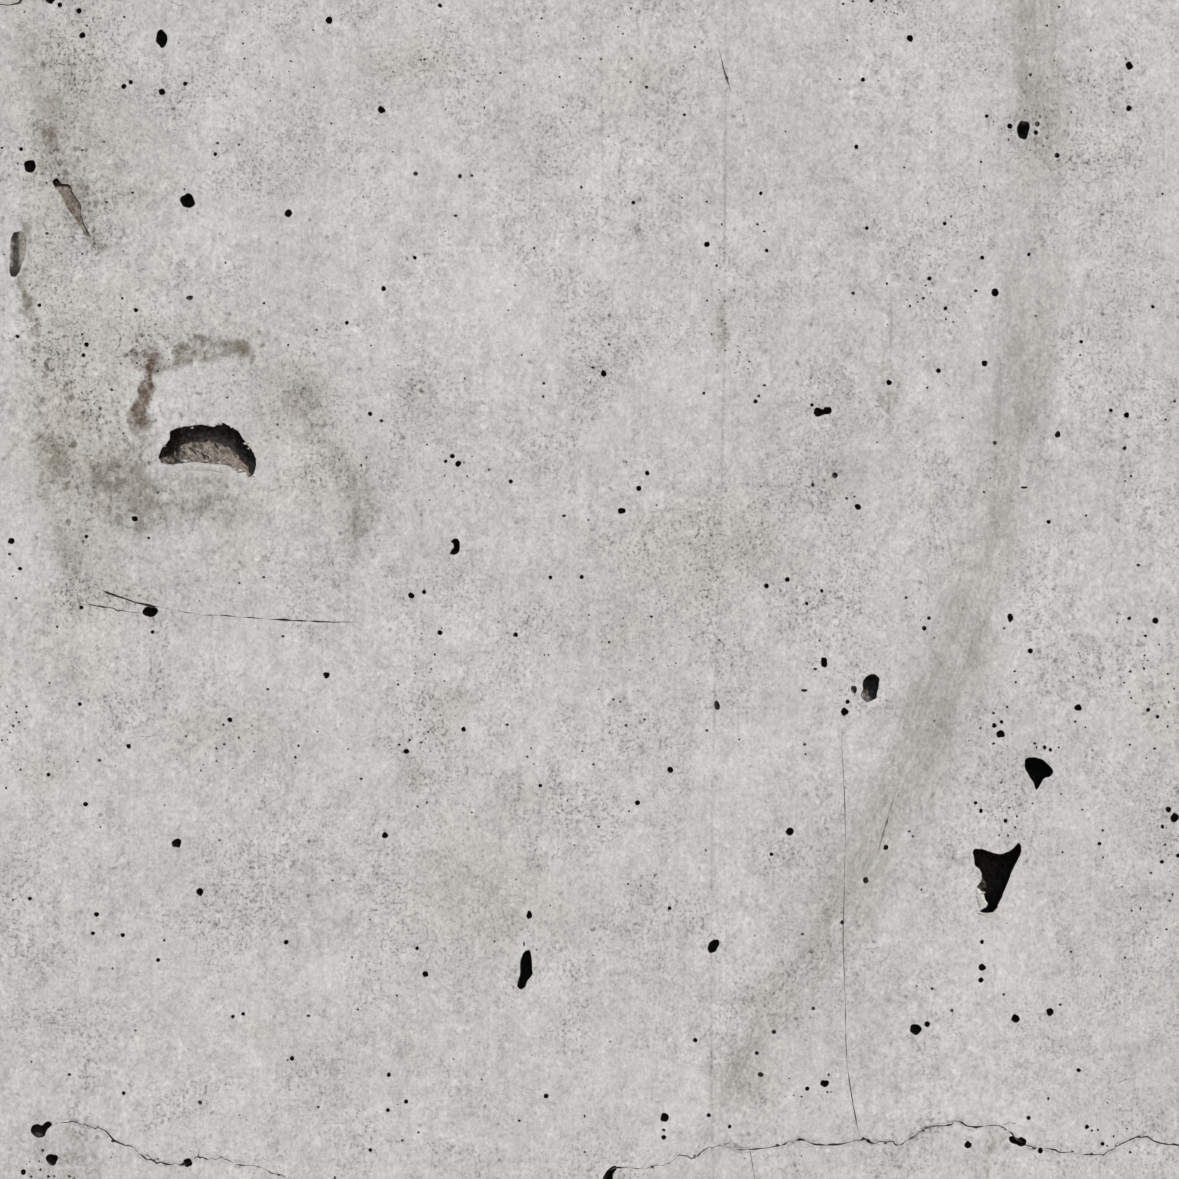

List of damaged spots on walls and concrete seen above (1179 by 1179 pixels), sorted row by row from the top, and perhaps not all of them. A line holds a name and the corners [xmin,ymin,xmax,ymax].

spalling [158,422,256,482]
spalling [1025,757,1053,790]
spalling [973,843,1022,918]
crack [605,733,1179,1179]
crack [56,1121,295,1179]